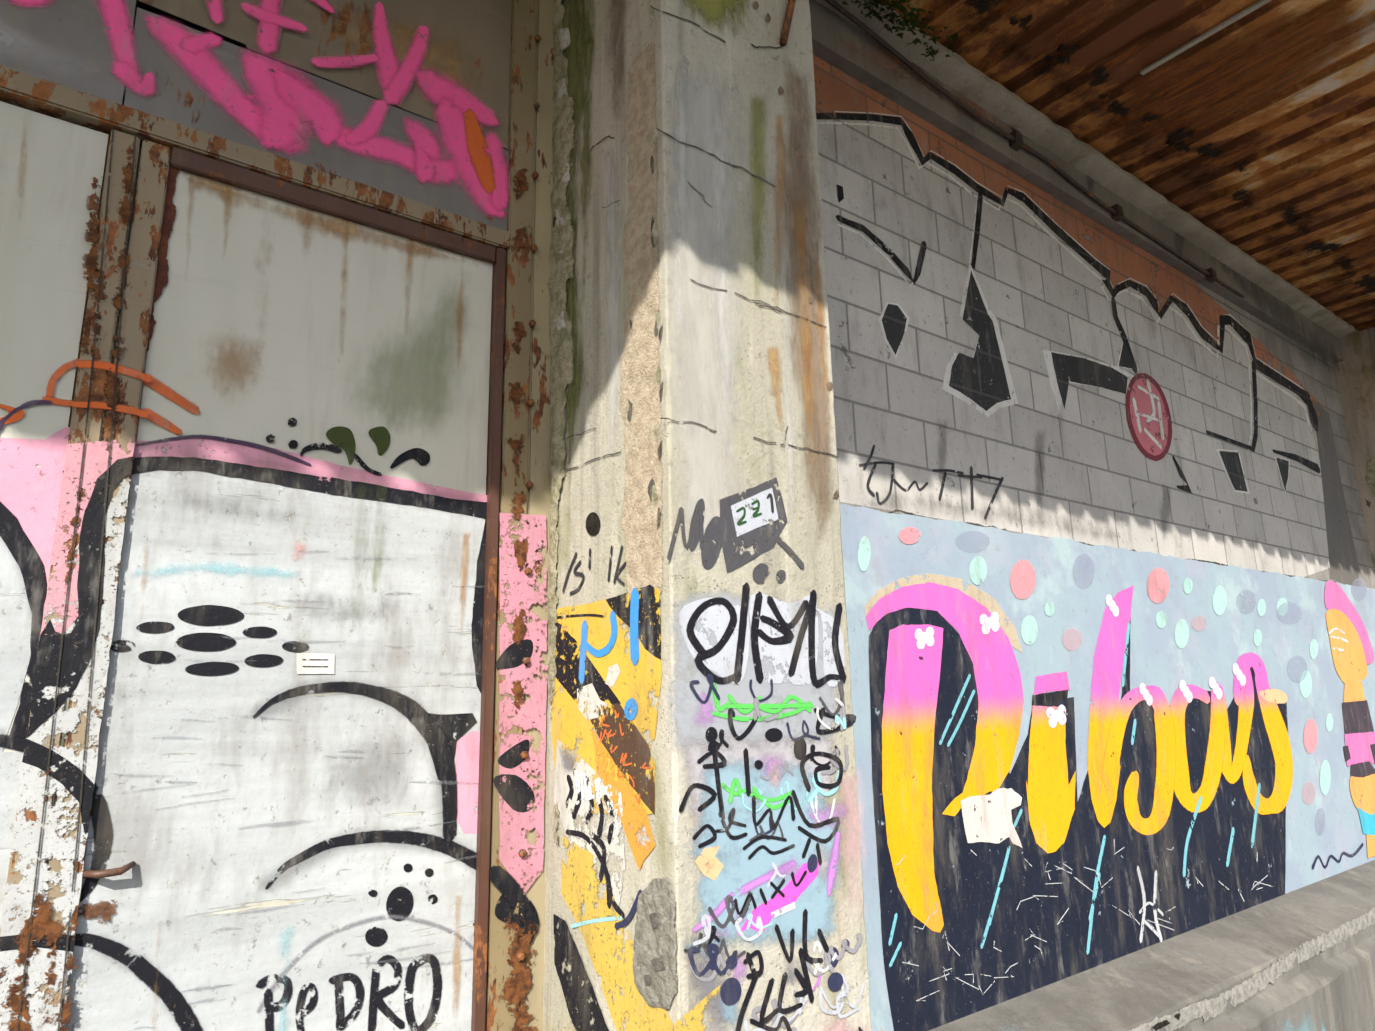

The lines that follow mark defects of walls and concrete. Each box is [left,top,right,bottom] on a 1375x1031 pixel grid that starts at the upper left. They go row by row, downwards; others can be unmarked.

corrosion [118,145,134,224]
corrosion [79,177,130,450]
spalling [547,0,575,719]
corrosion [62,491,85,606]
corrosion [5,893,117,1031]
corrosion [500,917,539,1031]